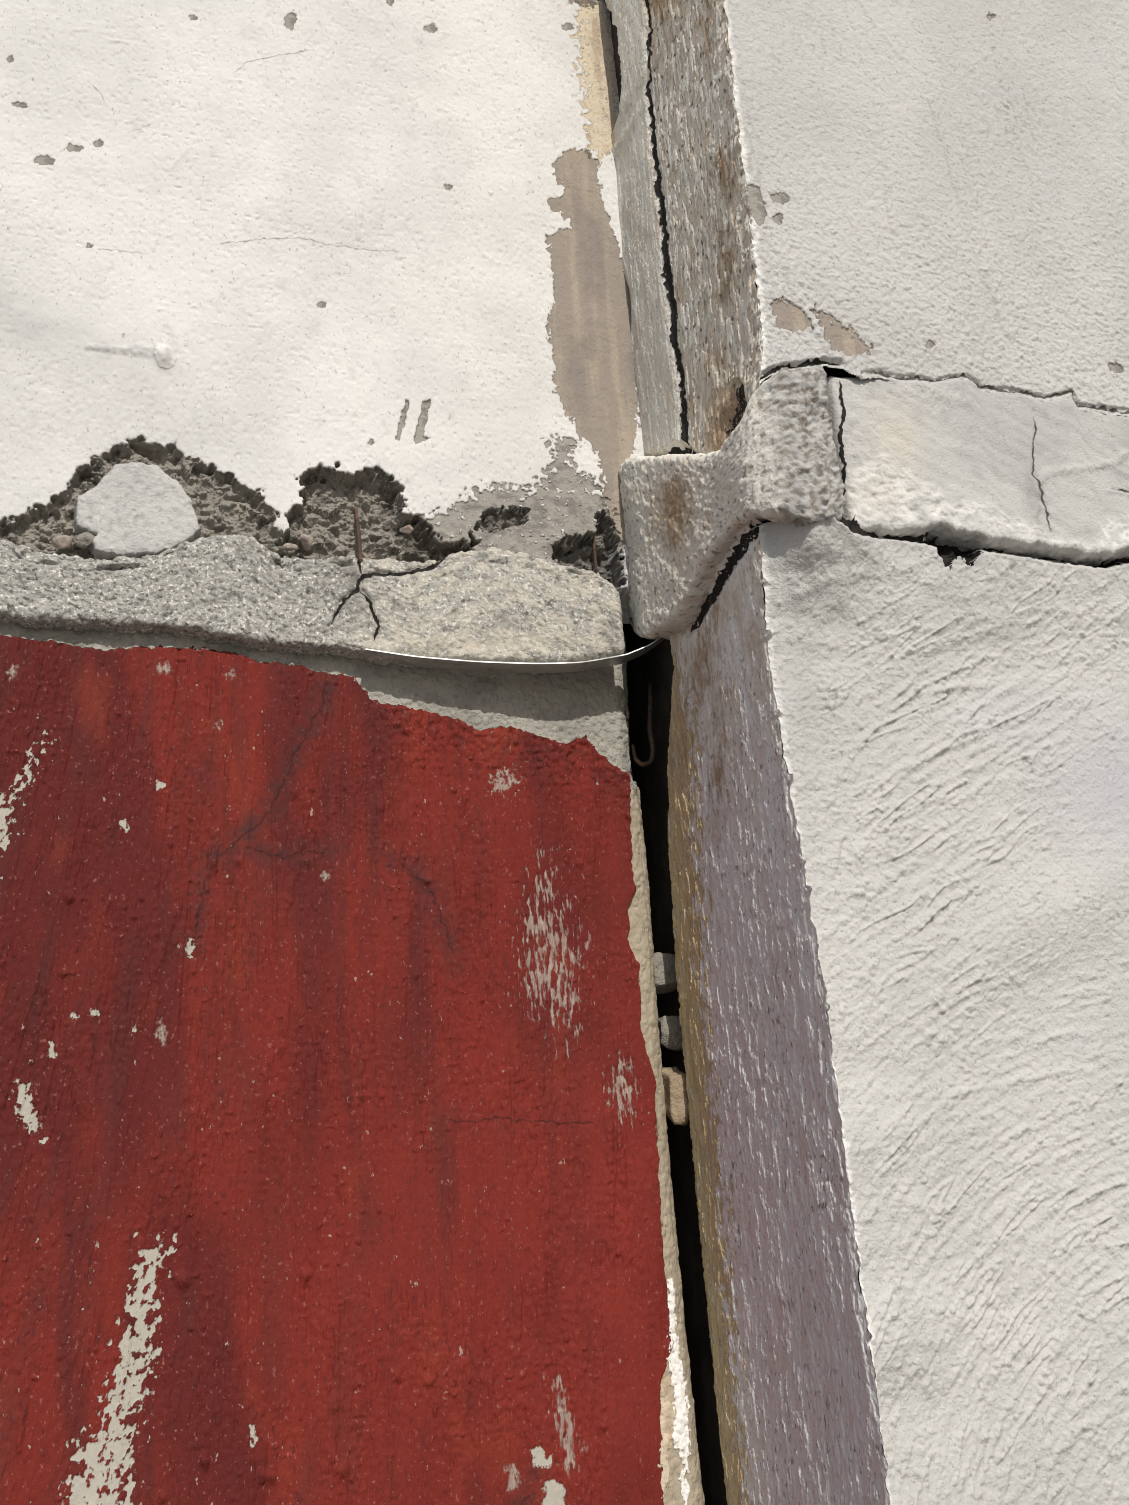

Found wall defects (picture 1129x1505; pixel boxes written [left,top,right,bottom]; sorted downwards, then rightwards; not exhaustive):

peeling [0,0,641,590]
crack [645,0,697,457]
crack [759,357,1129,568]
crack [332,557,446,640]
peeling [0,730,57,857]
peeling [0,622,640,798]
peeling [513,850,595,1057]
peeling [58,1232,179,1505]
peeling [504,1375,583,1505]